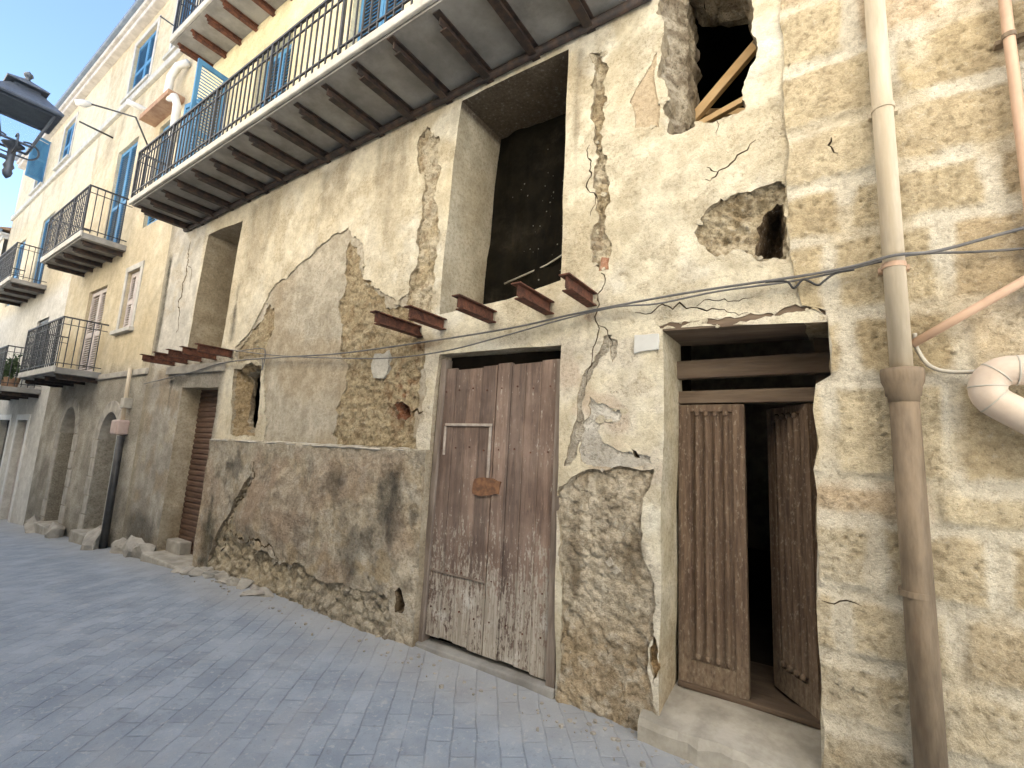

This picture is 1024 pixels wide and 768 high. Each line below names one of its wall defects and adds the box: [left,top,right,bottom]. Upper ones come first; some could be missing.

spalling [630,0,758,135]
crack [586,146,598,216]
spalling [589,50,612,271]
crack [705,140,756,181]
spalling [694,181,790,268]
peeling [230,127,441,449]
crack [586,272,613,385]
crack [635,297,753,315]
crack [217,461,278,564]
spalling [207,473,405,640]
spalling [555,335,660,731]